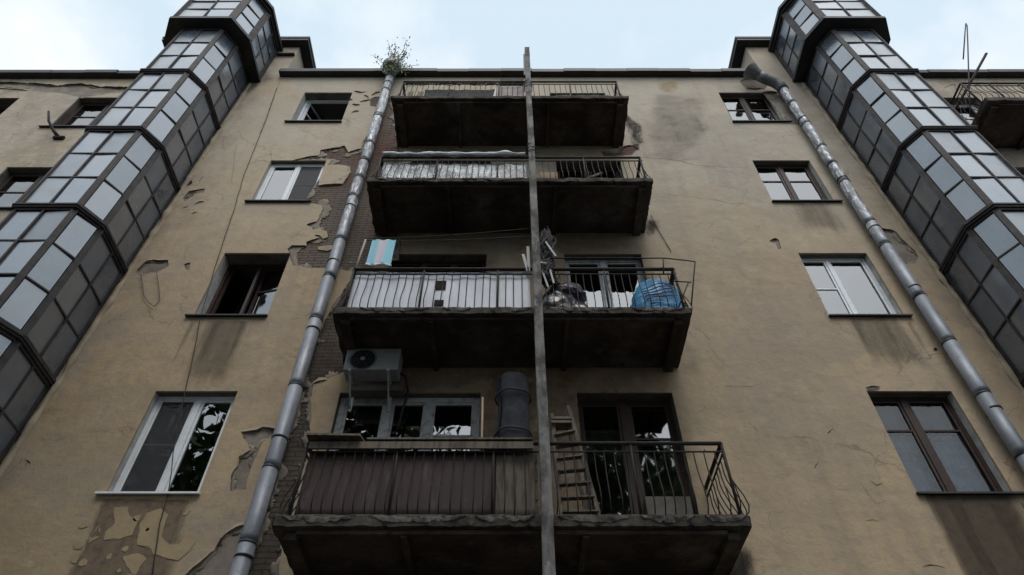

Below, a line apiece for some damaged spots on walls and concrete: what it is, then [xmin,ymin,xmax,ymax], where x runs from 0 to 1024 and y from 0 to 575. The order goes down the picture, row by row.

spalling [183,176,205,214]
spalling [136,258,169,276]
spalling [248,91,535,575]
spalling [230,424,275,491]
peeling [70,499,245,575]